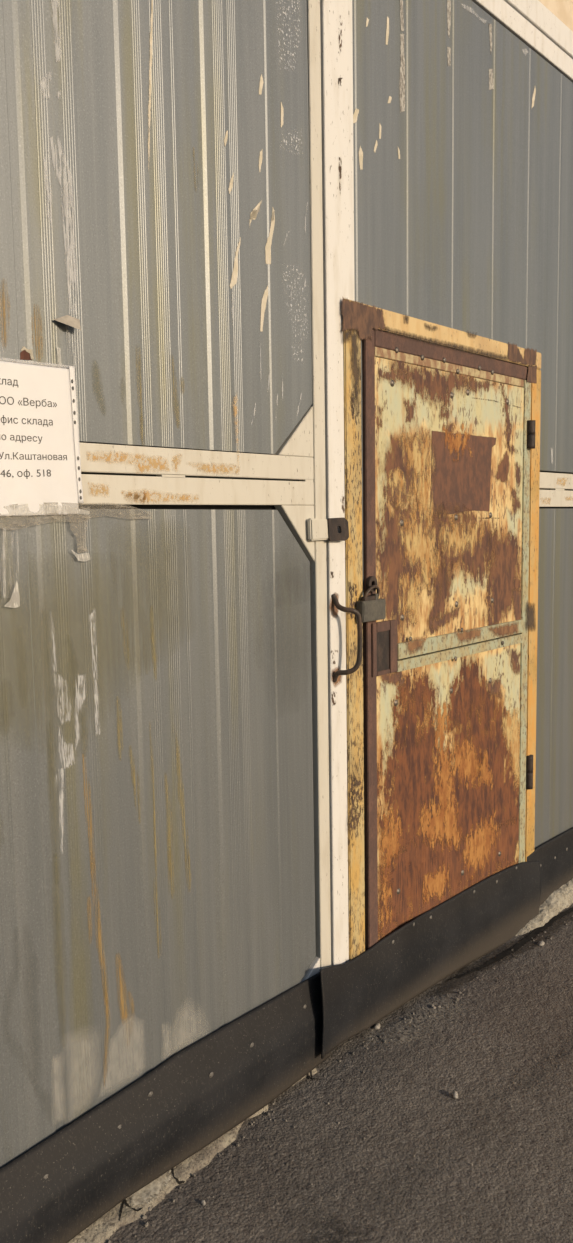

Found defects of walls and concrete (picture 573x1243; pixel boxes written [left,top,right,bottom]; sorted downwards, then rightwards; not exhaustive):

peeling [230,237,241,288]
peeling [249,200,275,264]
peeling [260,286,268,332]
corrosion [341,298,537,419]
corrosion [88,453,178,472]
corrosion [88,483,196,502]
peeling [389,424,484,623]
corrosion [330,582,358,620]
corrosion [348,360,536,941]
damp [56,613,100,851]
peeling [502,709,520,786]
peeling [418,702,501,904]